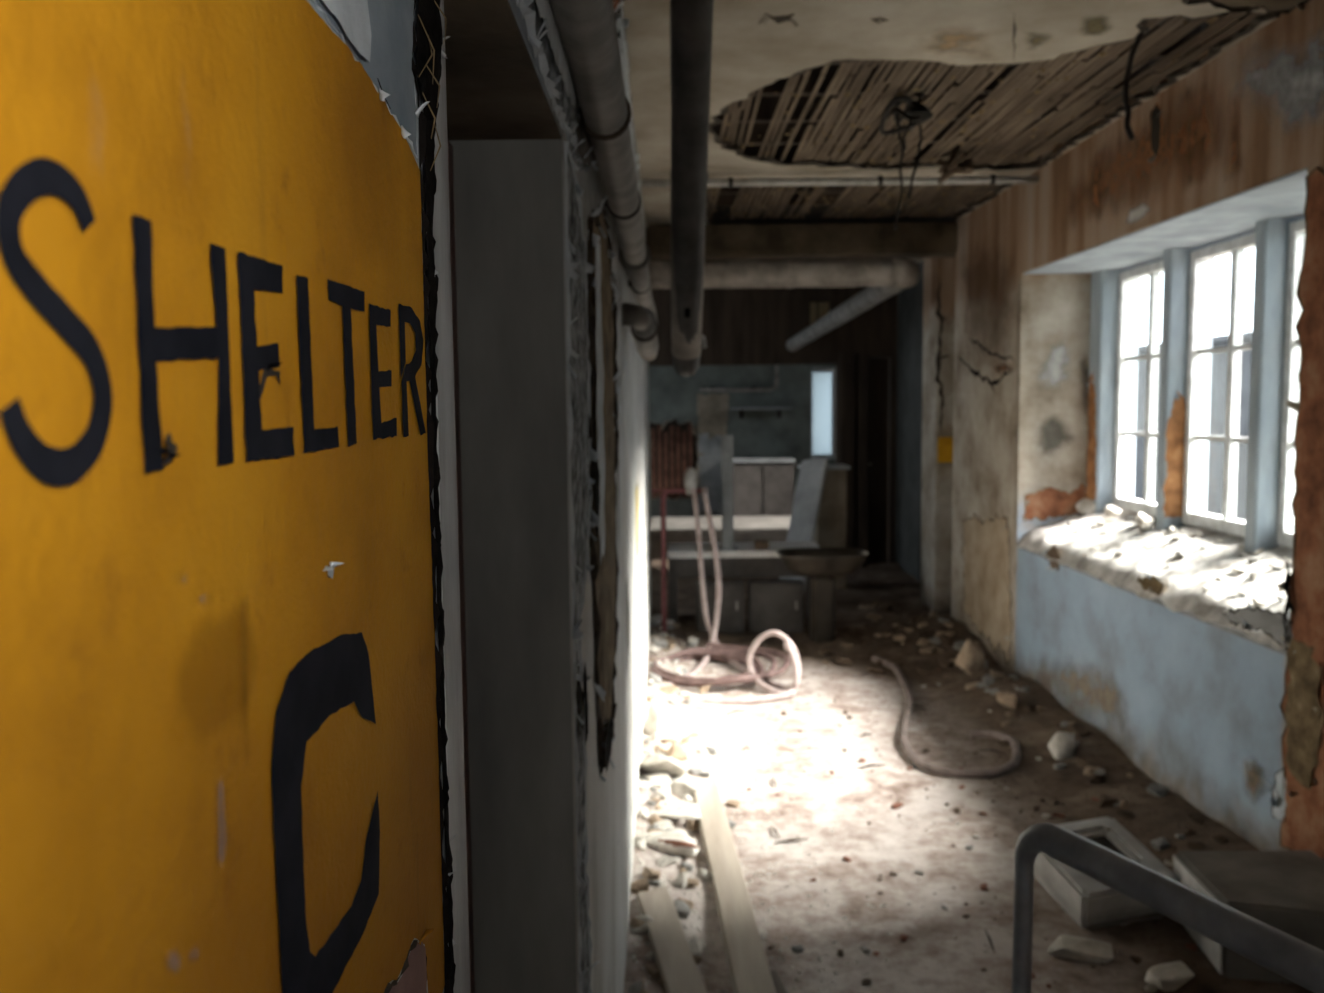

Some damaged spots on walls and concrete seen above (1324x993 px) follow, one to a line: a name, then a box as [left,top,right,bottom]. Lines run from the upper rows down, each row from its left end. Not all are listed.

peeling [313,0,430,158]
flaking render [758,13,799,28]
flaking render [1148,102,1163,163]
flaking render [1239,40,1324,125]
crack [933,276,1020,453]
peeling [516,0,623,993]
peeling [960,483,1086,666]
flaking render [1137,573,1164,595]
flaking render [1222,167,1324,860]
peeling [384,928,434,993]